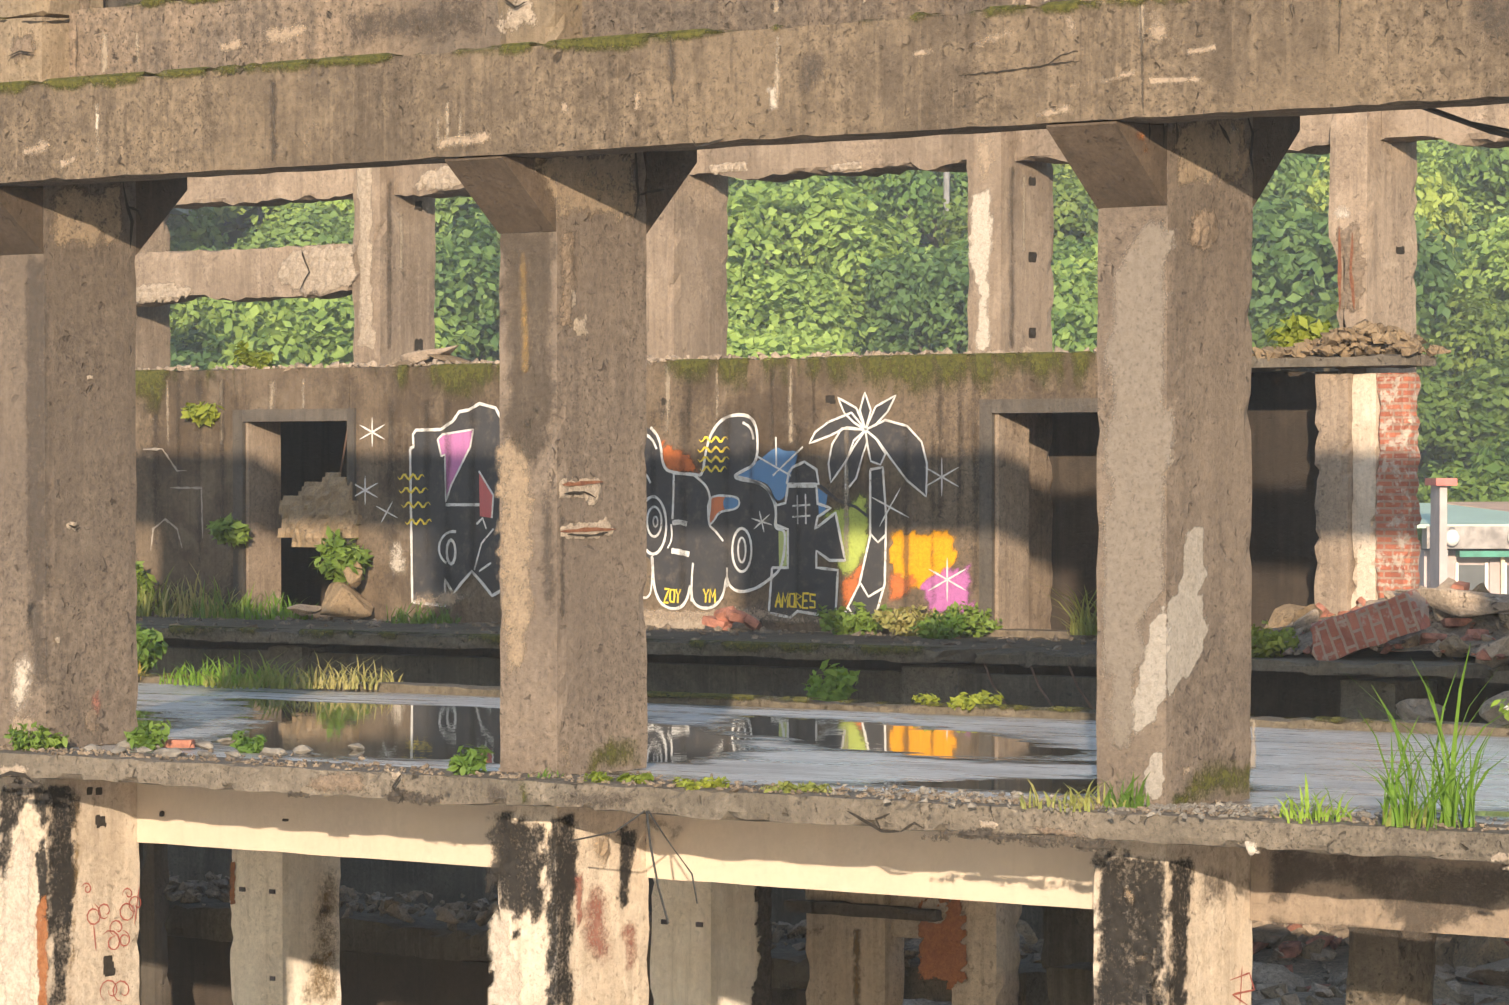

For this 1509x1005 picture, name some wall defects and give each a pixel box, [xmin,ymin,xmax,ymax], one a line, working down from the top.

crack [0,0,106,62]
peeling [1102,222,1209,749]
peeling [1143,752,1165,800]
water stain [0,785,80,1005]
water stain [488,913,522,1005]
water stain [544,795,629,1005]